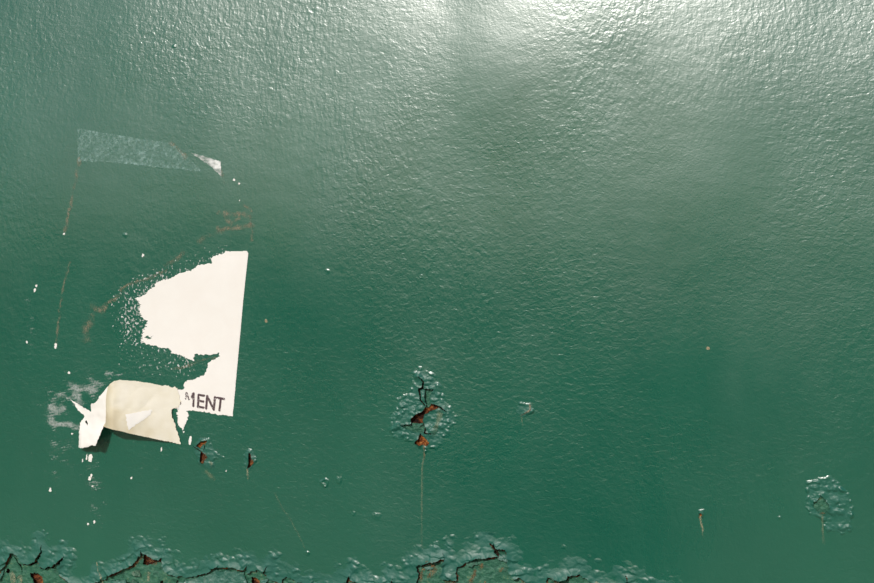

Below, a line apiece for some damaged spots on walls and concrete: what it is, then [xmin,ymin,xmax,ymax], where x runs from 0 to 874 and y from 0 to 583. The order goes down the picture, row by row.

corrosion [388,366,458,455]
peeling [0,524,683,583]